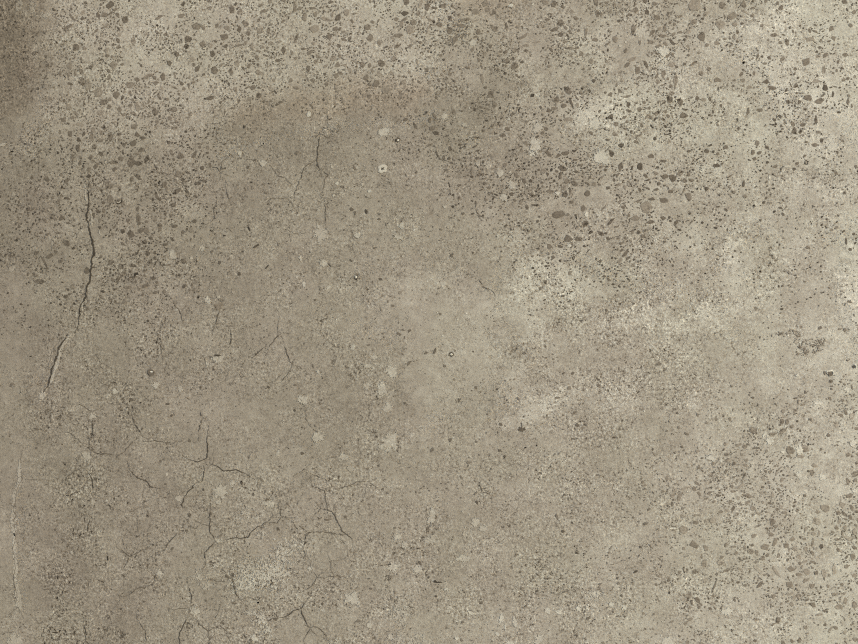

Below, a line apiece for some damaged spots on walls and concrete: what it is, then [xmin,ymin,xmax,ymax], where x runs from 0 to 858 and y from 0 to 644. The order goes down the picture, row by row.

crack [39,164,95,400]
crack [0,376,385,644]